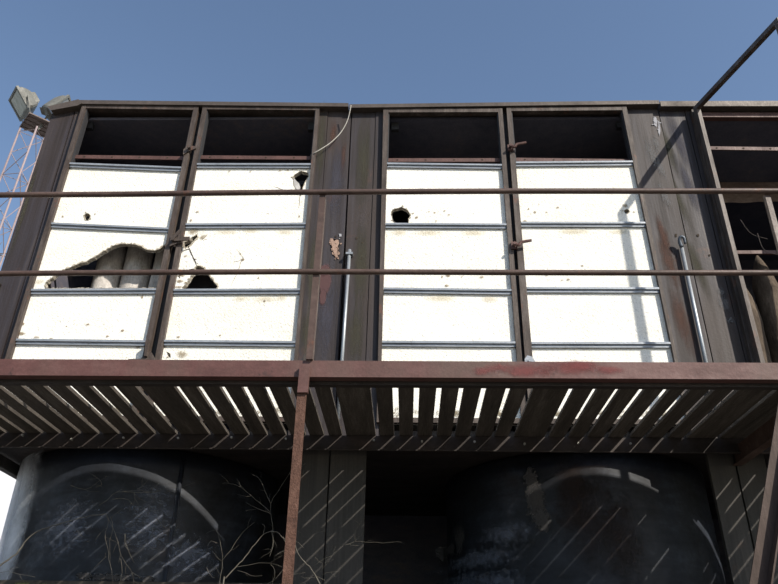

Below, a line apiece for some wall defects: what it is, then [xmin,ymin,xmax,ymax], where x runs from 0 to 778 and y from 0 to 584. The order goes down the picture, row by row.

peeling [329,234,342,259]